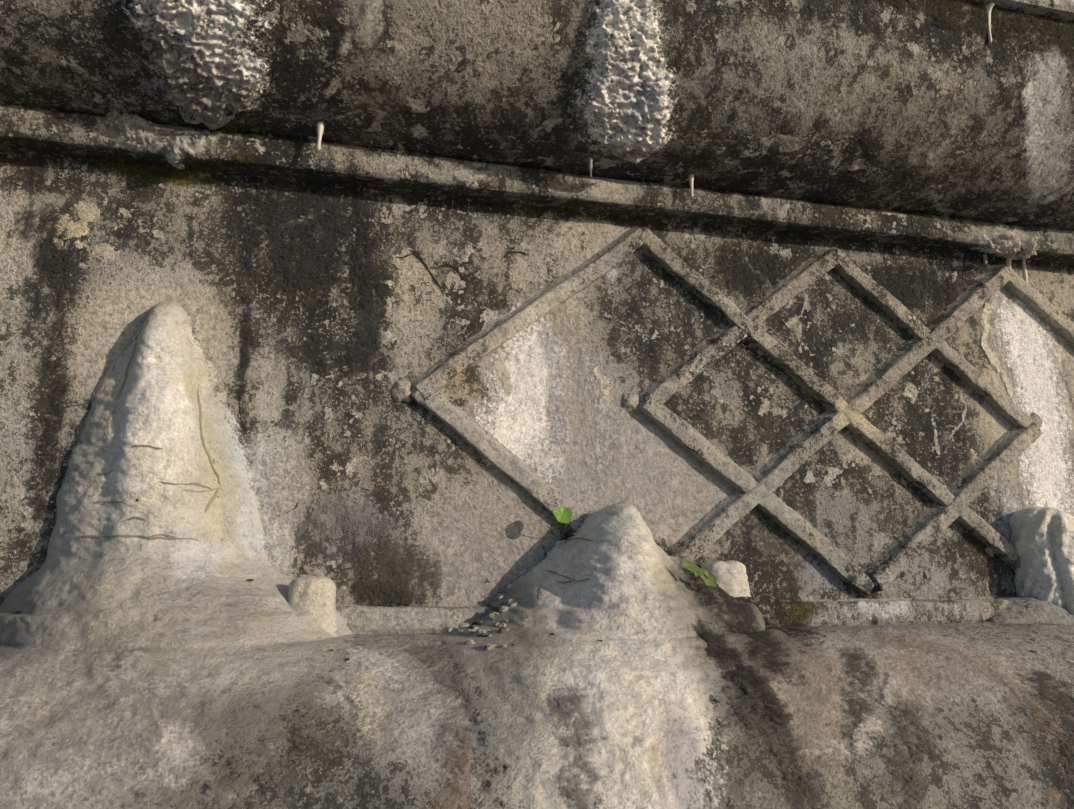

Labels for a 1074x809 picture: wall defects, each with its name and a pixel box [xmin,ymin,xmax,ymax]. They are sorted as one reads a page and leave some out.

damp [606,268,618,283]
damp [711,246,793,300]
damp [872,263,973,314]
crack [80,501,200,541]
crack [159,387,221,513]
damp [0,178,442,809]
damp [474,311,625,484]
damp [839,286,1074,663]
damp [409,502,927,809]
damp [1018,669,1074,809]